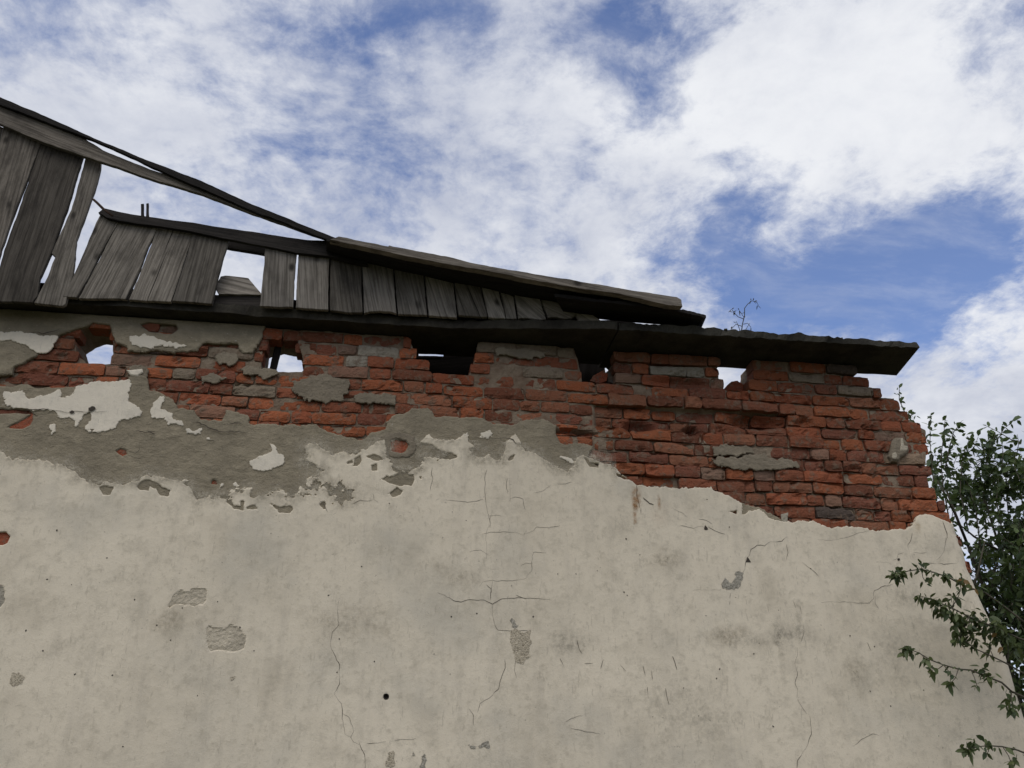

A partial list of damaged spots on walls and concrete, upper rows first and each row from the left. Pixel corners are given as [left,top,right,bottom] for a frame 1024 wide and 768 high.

flaking render [0,309,598,513]
crack [430,471,570,631]
spalling [169,589,218,609]
spalling [722,557,751,598]
spalling [206,625,255,651]
spalling [510,618,532,664]